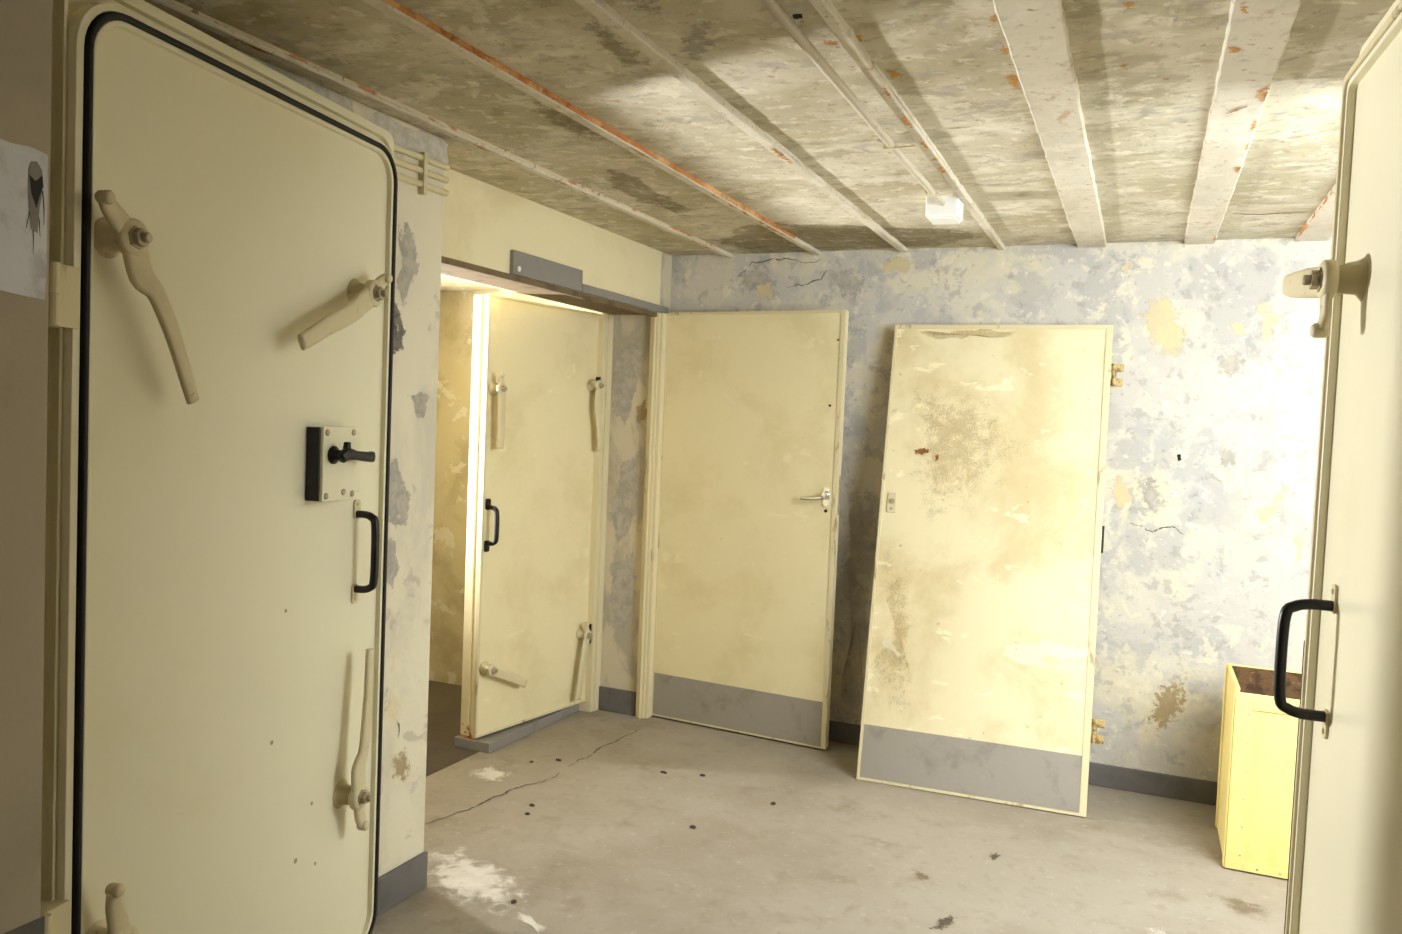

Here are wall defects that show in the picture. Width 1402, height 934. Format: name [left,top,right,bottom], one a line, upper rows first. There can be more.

rust [166,0,795,249]
rust [763,131,802,164]
peeling [824,256,918,304]
peeling [1137,285,1188,362]
peeling [1215,299,1280,381]
peeling [411,392,429,418]
flaking render [1167,446,1189,470]
peeling [1216,442,1242,472]
peeling [1112,471,1171,517]
crack [427,729,639,824]